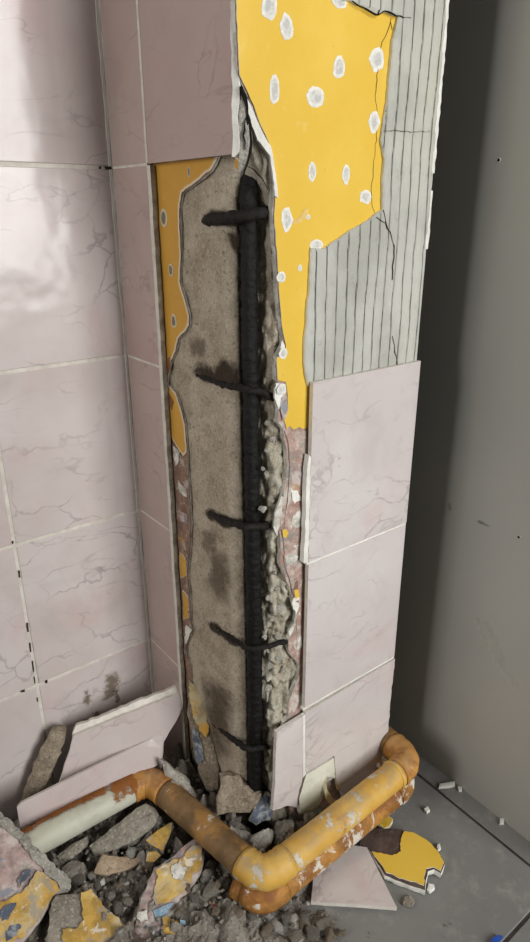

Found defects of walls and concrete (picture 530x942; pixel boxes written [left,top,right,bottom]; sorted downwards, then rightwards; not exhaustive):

spalling [261,0,293,40]
spalling [333,56,345,78]
spalling [369,47,384,72]
crack [352,1,411,106]
spalling [269,74,279,104]
spalling [306,86,324,108]
spalling [368,111,380,134]
spalling [308,161,316,182]
spalling [342,164,350,185]
spalling [360,190,371,204]
crack [371,130,428,280]
spalling [166,96,307,794]